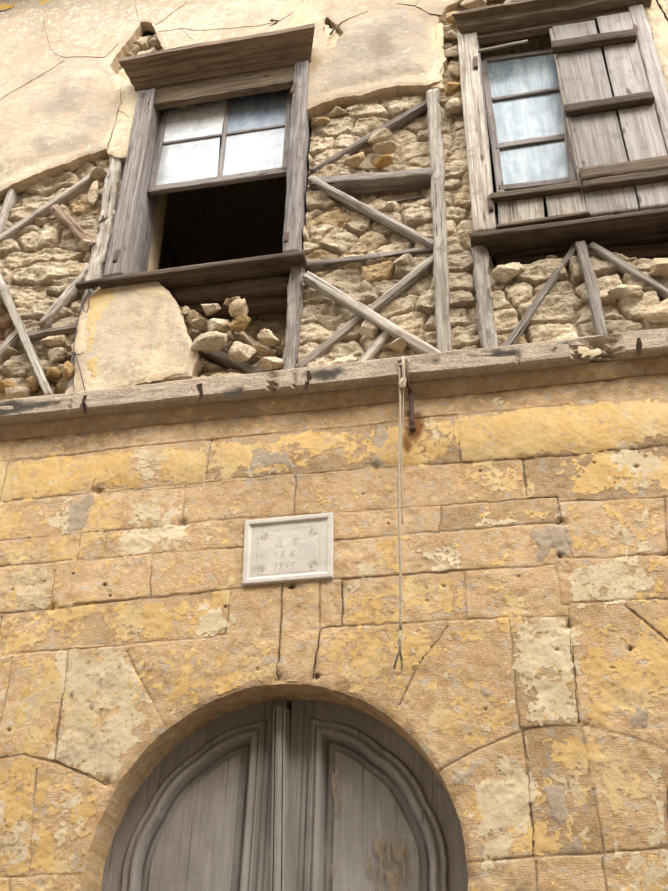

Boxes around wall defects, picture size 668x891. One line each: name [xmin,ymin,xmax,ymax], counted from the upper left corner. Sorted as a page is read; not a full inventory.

crack [2,3,118,99]
crack [135,1,304,39]
peeling [287,3,342,47]
crack [328,11,368,35]
crack [397,0,442,16]
crack [656,0,668,21]
crack [107,80,129,150]
spalling [297,0,506,367]
spalling [0,158,115,400]
spalling [130,284,287,386]
spalling [486,248,668,358]
peeling [0,395,668,891]